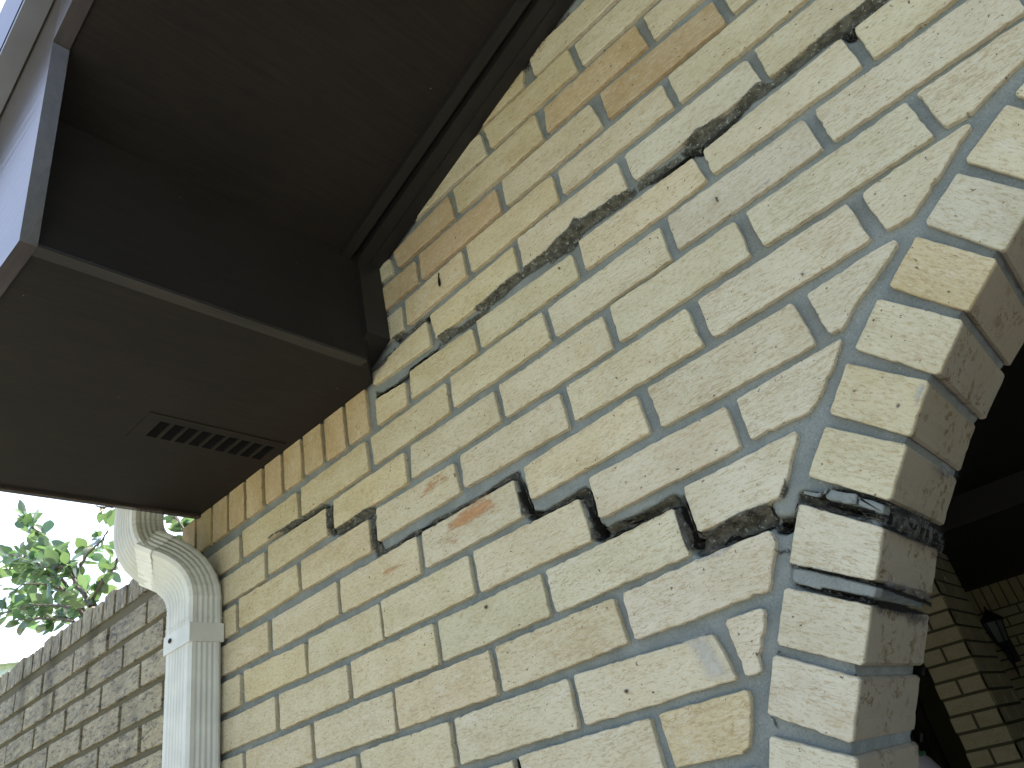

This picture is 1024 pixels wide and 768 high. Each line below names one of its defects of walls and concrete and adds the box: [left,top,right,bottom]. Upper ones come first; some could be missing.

crack [373,0,887,399]
crack [268,472,945,615]